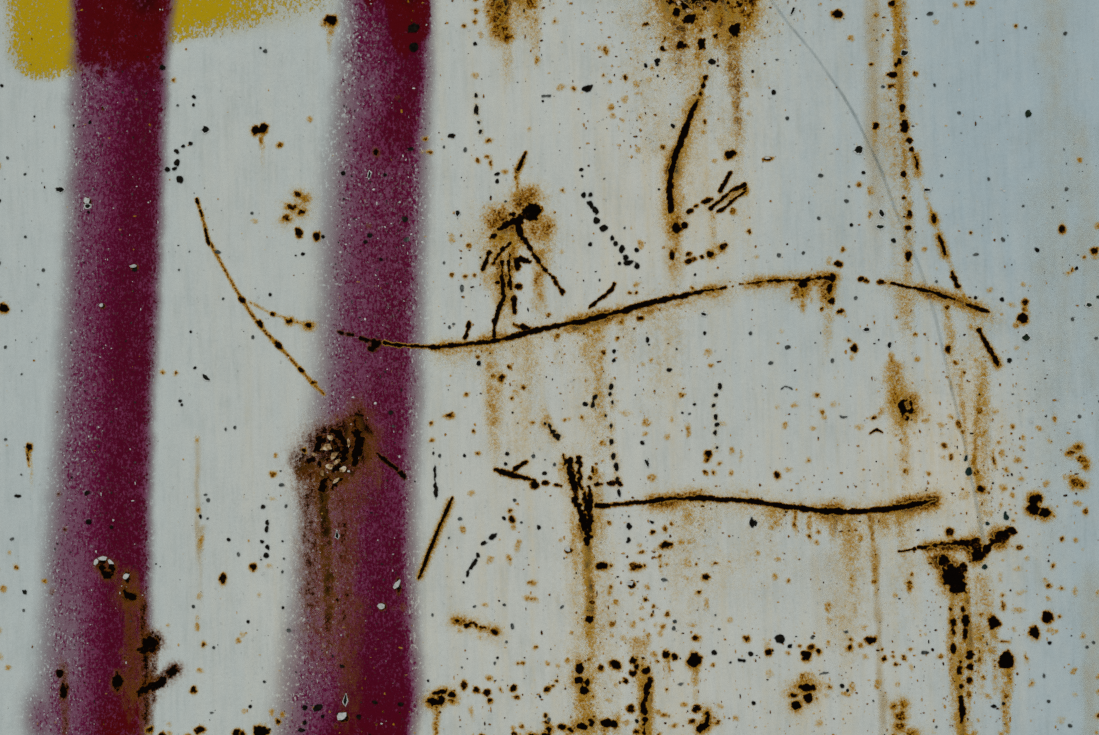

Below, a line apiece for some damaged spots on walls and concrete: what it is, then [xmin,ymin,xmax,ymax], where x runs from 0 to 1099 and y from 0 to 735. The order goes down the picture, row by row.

corrosion [461,0,541,46]
corrosion [642,0,766,156]
corrosion [280,190,312,224]
corrosion [449,138,566,338]
corrosion [870,0,1056,735]
corrosion [123,575,183,735]
corrosion [274,402,407,671]
corrosion [422,686,459,735]
corrosion [487,508,521,564]
corrosion [511,456,678,735]
corrosion [694,704,738,735]
corrosion [786,672,854,714]